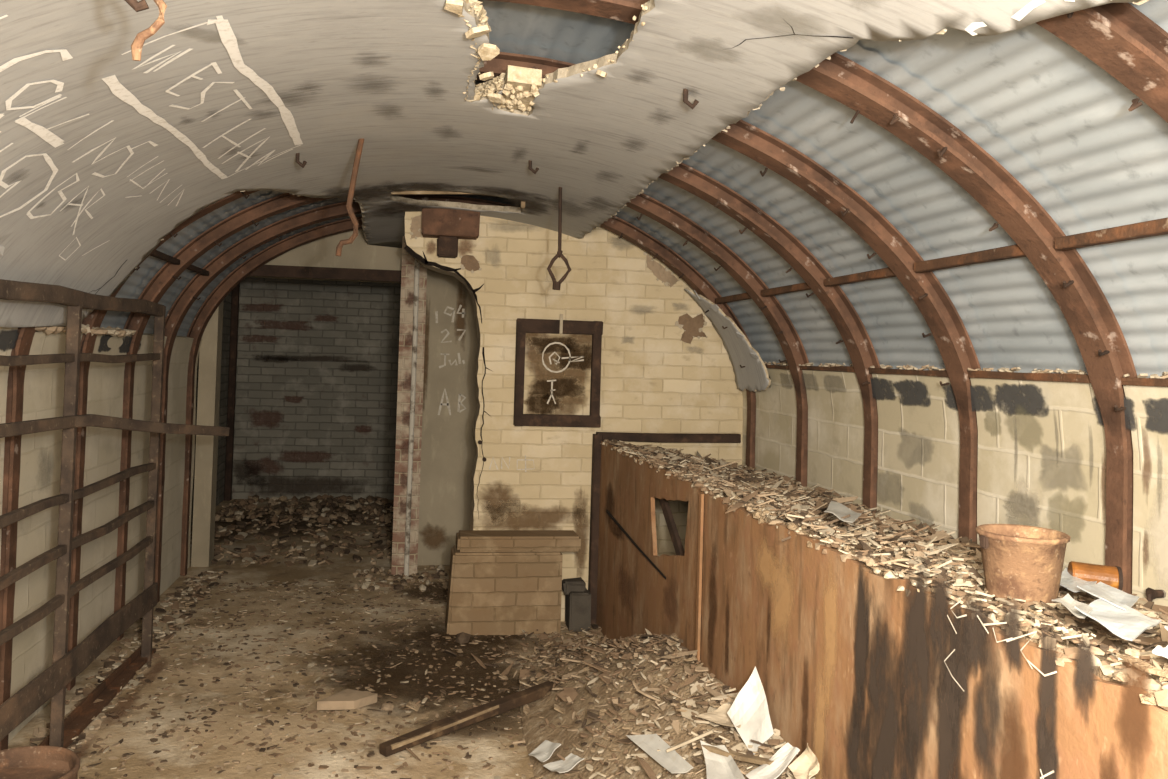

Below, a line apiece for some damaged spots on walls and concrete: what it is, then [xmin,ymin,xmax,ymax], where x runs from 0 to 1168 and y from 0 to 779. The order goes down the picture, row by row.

spalling [444,0,633,113]
peeling [643,252,771,392]
crack [404,245,492,518]
water stain [484,485,587,567]
water stain [1153,499,1168,582]